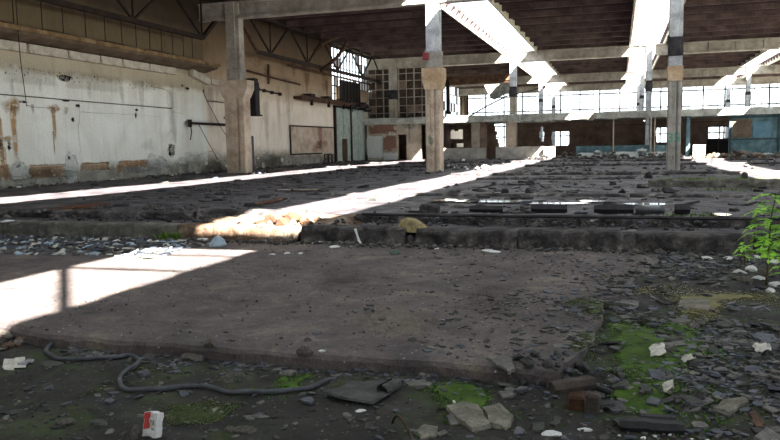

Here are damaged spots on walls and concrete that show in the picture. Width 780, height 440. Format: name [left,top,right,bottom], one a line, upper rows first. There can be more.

corrosion [0,99,18,170]
corrosion [49,106,58,151]
spalling [0,144,185,183]
flaking render [366,125,398,160]